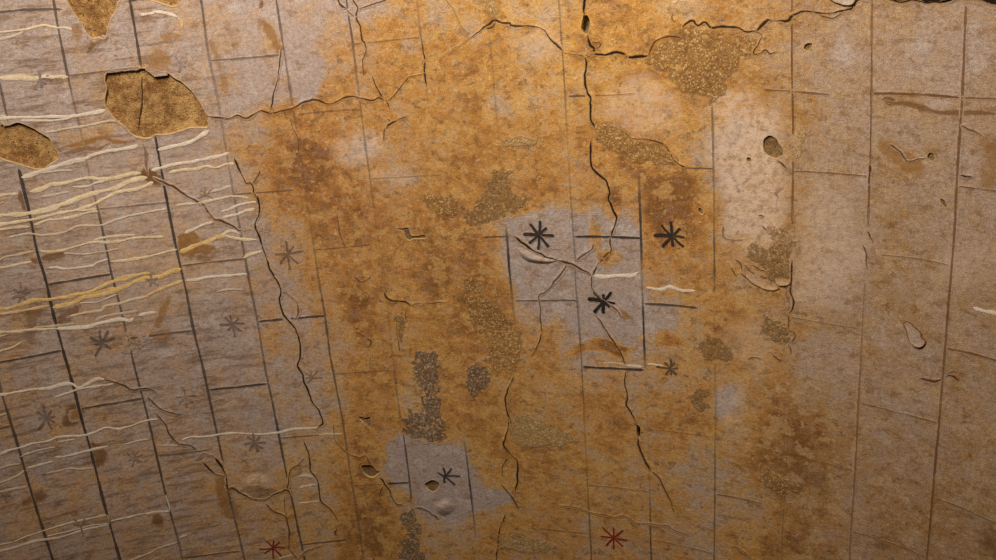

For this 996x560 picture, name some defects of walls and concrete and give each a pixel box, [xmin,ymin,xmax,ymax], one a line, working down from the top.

flaking render [0,122,60,170]
efflorescence [0,144,167,238]
flaking render [66,0,121,40]
flaking render [104,67,210,140]
flaking render [601,21,769,107]
water stain [0,267,247,352]
water stain [0,228,257,270]
water stain [151,0,628,560]
crack [207,0,996,511]
water stain [499,0,996,560]
crack [104,158,439,560]
crack [493,376,522,560]